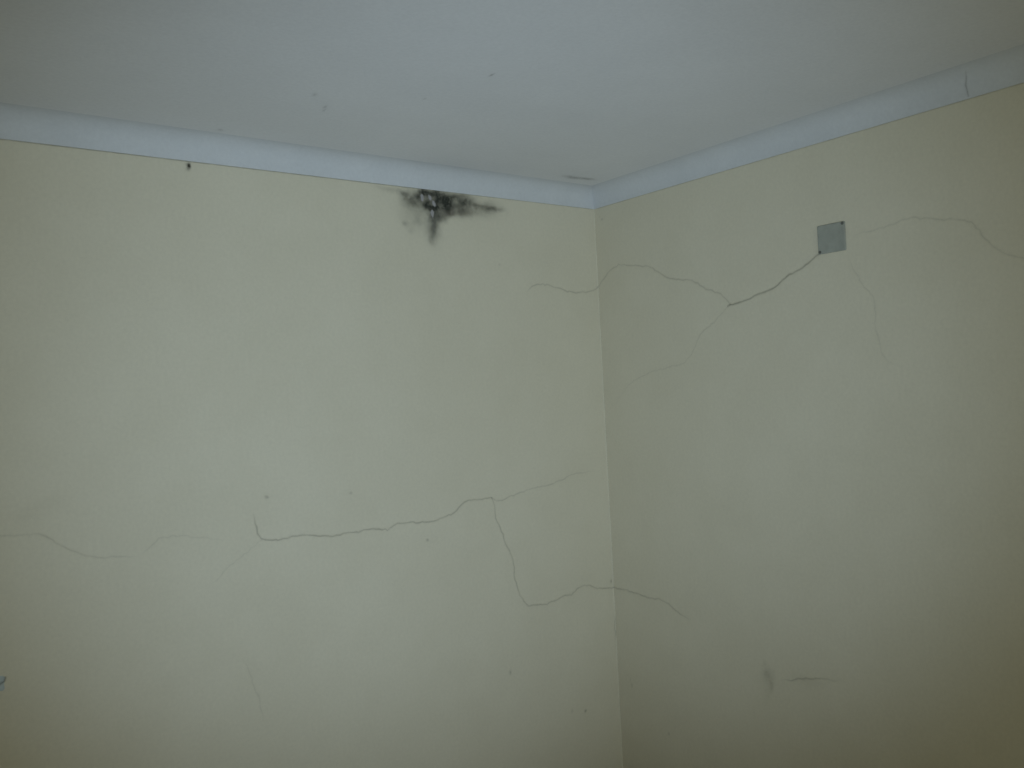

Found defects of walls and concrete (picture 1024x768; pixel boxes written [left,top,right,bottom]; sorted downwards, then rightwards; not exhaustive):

leakage [416,189,465,218]